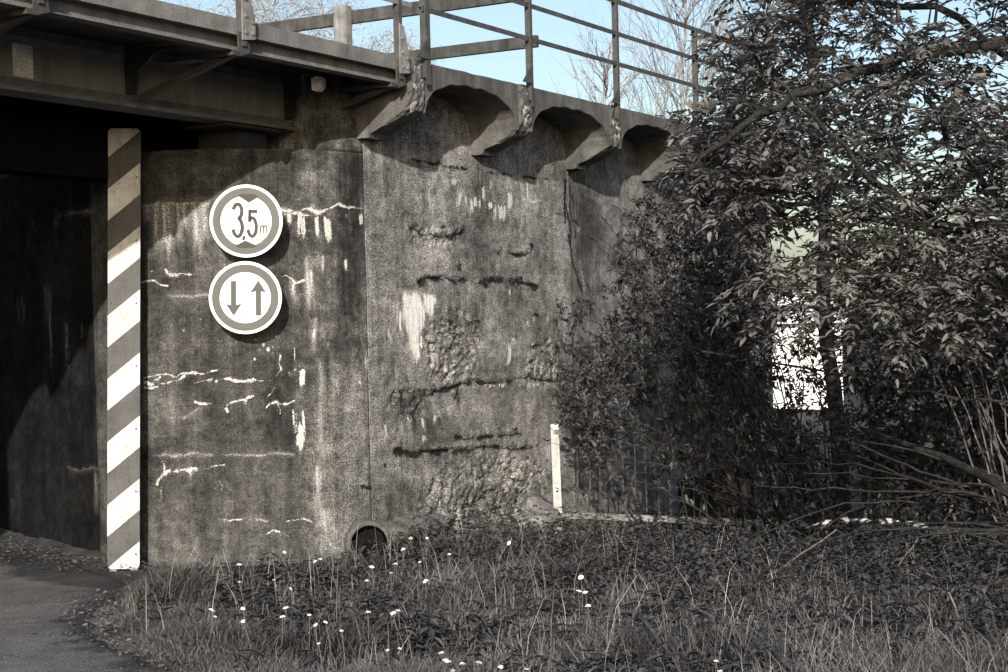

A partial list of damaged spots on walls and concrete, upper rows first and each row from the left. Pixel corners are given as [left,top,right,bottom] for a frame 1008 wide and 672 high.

peeling [397,280,481,390]
efflorescence [292,409,306,451]